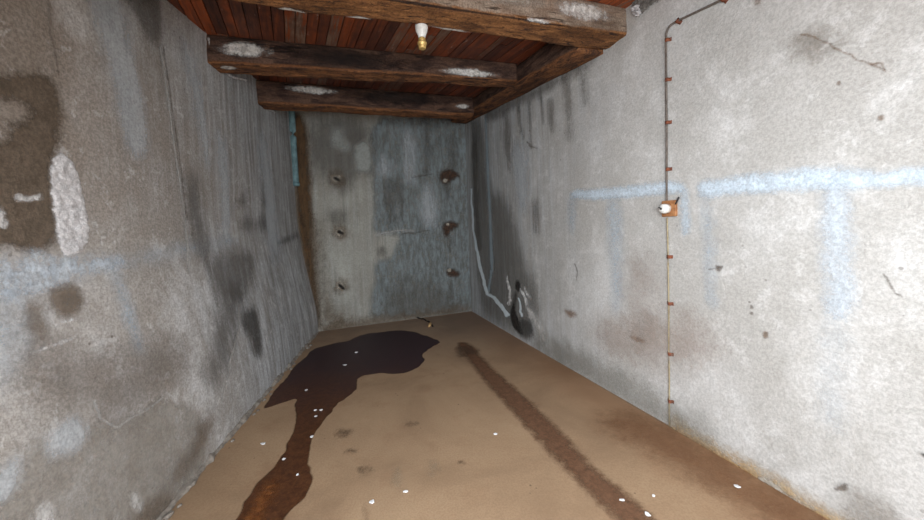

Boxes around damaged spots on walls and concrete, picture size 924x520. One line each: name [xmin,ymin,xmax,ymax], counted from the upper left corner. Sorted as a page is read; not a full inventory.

water stain [0,72,64,253]
water stain [92,0,147,153]
water stain [51,285,82,315]
water stain [236,117,545,520]
water stain [459,342,653,520]